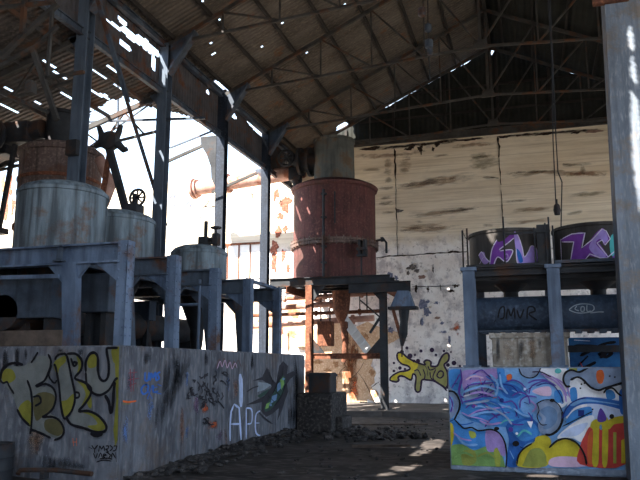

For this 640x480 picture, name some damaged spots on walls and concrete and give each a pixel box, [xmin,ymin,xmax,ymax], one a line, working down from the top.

crack [491,137,503,217]
peeling [270,187,292,274]
spalling [406,263,434,279]
peeling [314,322,380,402]
corrosion [343,335,358,398]
peeling [388,327,399,344]
spalling [419,299,451,345]